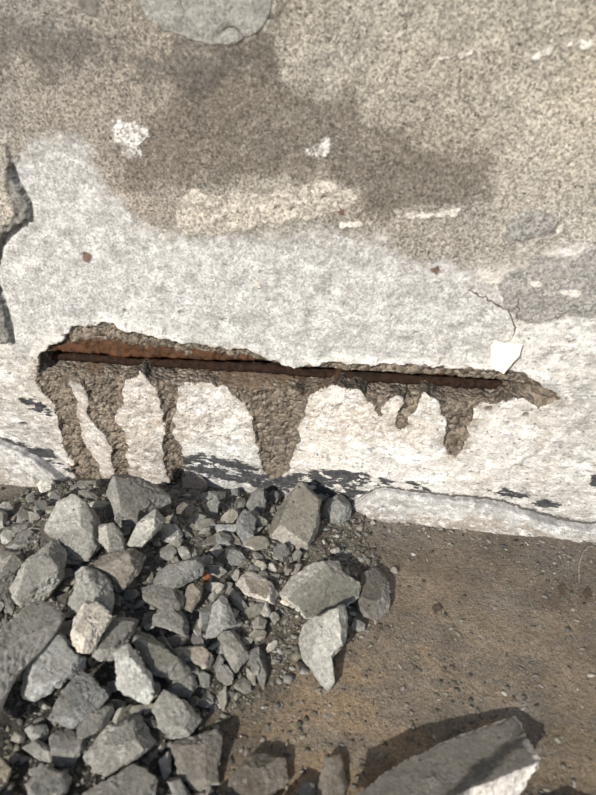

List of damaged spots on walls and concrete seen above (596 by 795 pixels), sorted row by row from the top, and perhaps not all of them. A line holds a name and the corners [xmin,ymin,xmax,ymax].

damp [339,221,372,229]
damp [397,208,460,220]
peeling [0,137,560,485]
crack [467,289,520,339]
rust [51,337,265,363]